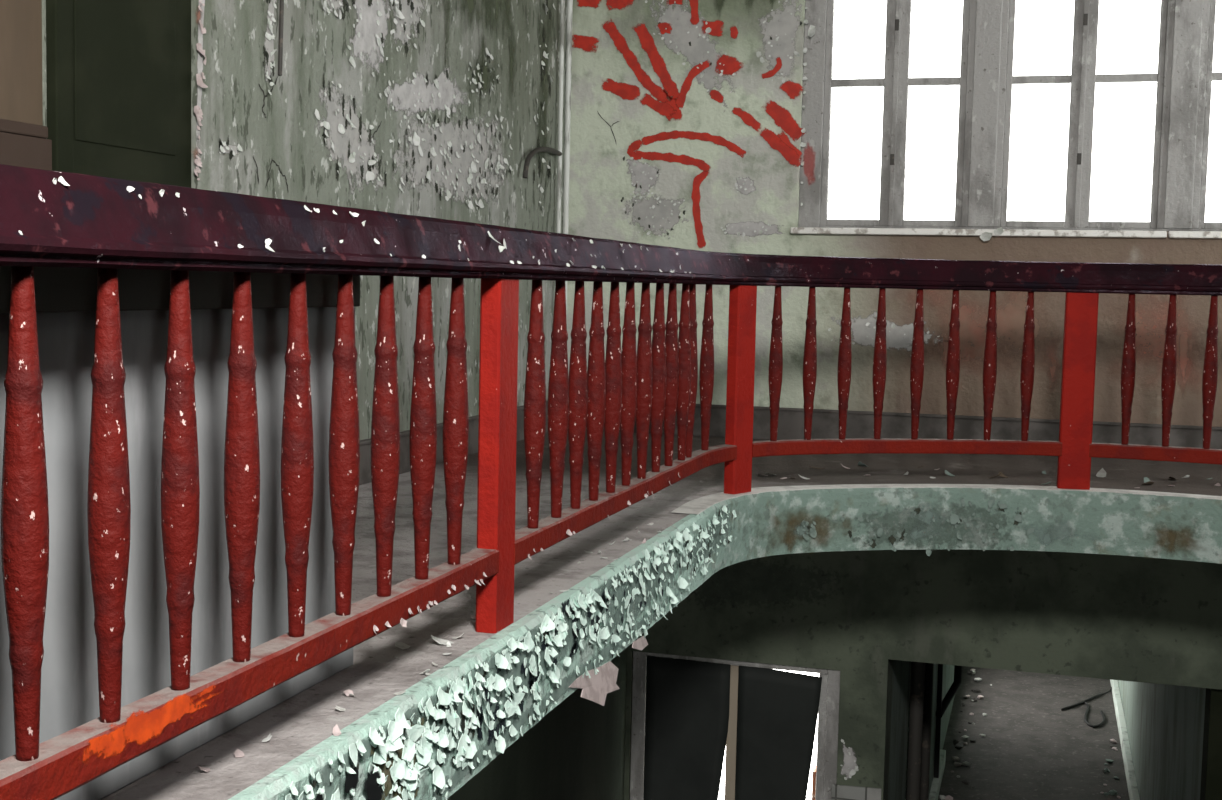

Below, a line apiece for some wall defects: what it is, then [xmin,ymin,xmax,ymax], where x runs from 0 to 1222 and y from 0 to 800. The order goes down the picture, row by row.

peeling [314,0,513,210]
peeling [82,685,219,762]
peeling [280,506,737,800]